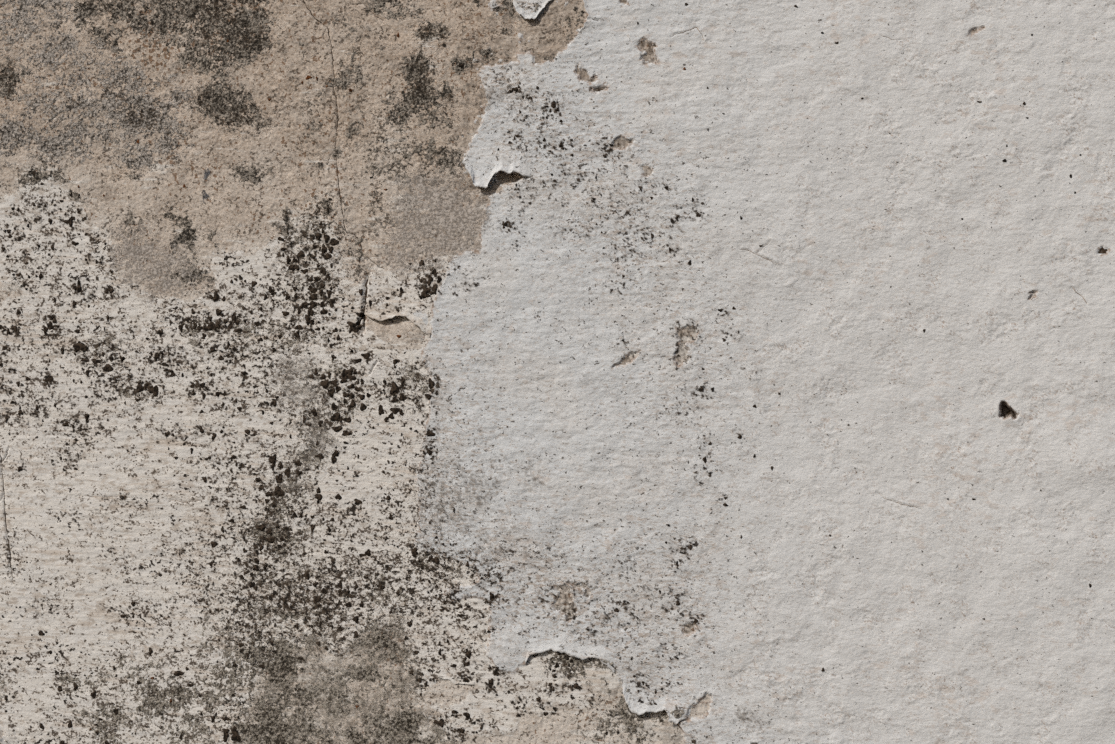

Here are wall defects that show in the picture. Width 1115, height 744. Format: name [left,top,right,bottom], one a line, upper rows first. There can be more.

peeling [0,0,594,307]
crack [303,0,383,329]
peeling [364,301,431,347]
peeling [243,627,713,744]